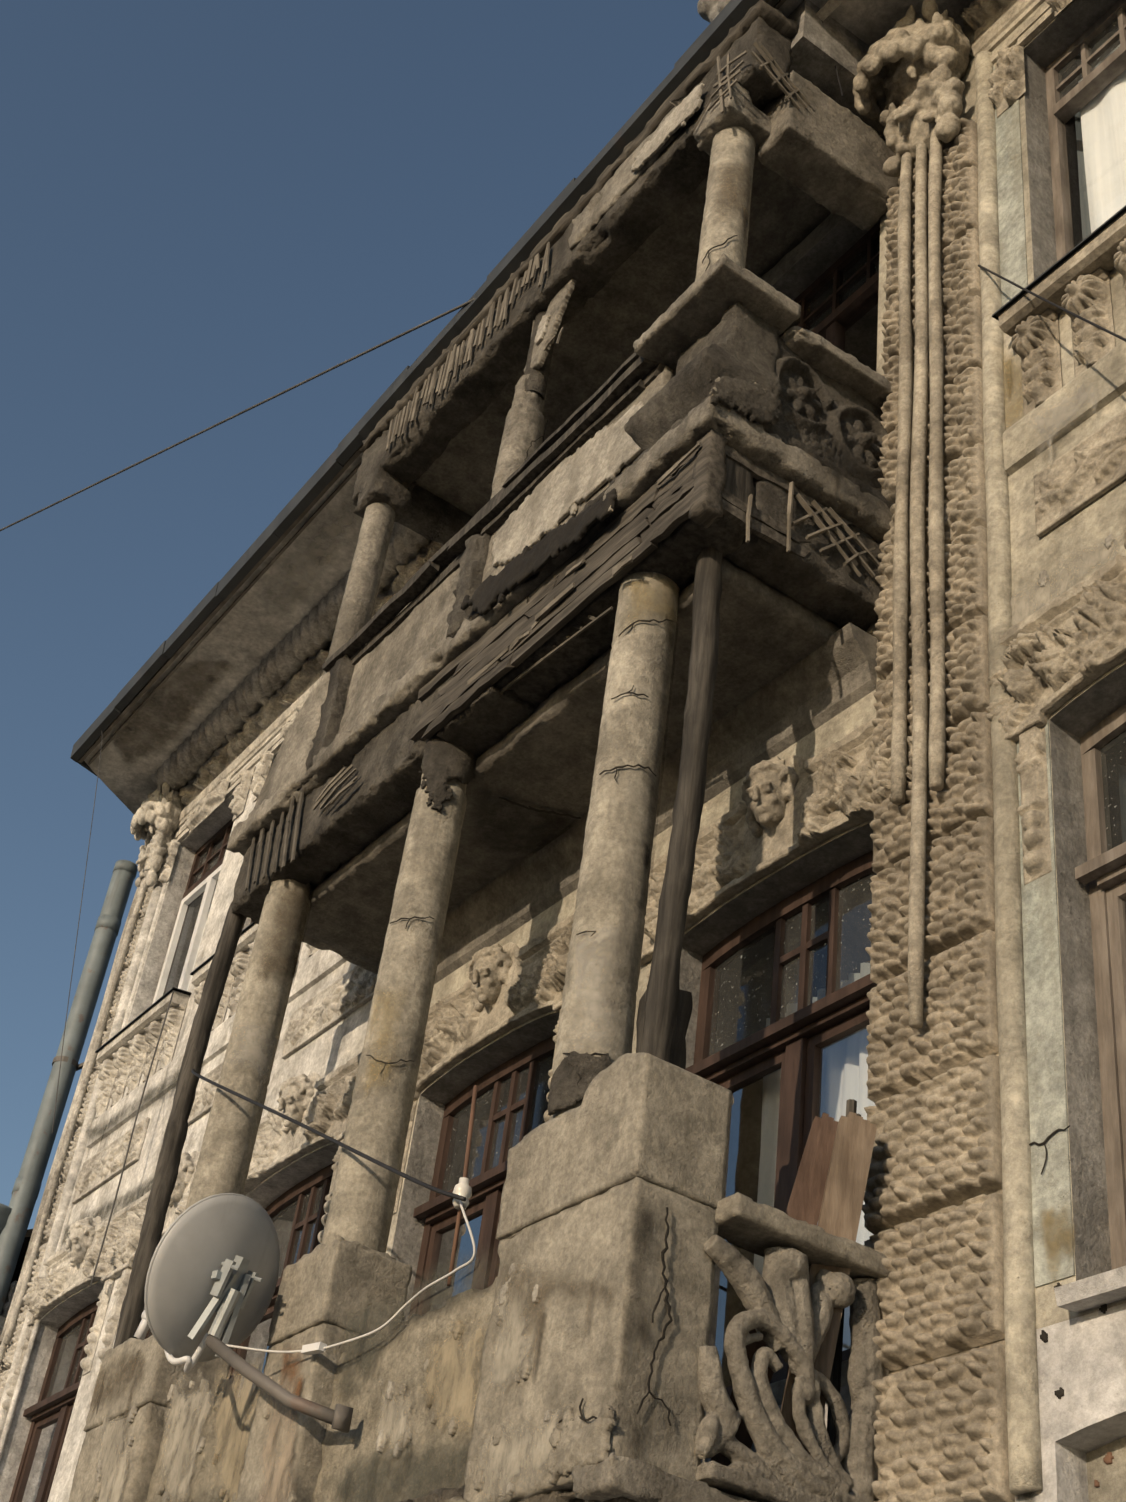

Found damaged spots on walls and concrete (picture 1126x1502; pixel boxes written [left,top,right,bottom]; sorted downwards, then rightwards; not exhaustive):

flaking render [461,401,644,616]
crack [619,619,674,636]
crack [611,685,649,700]
crack [599,764,657,782]
crack [390,916,434,929]
crack [366,1055,414,1074]
flaking render [423,1263,541,1436]
crack [558,1207,673,1426]
flaking render [157,1365,297,1502]
flaking render [376,1381,412,1458]
spalling [445,1404,615,1502]